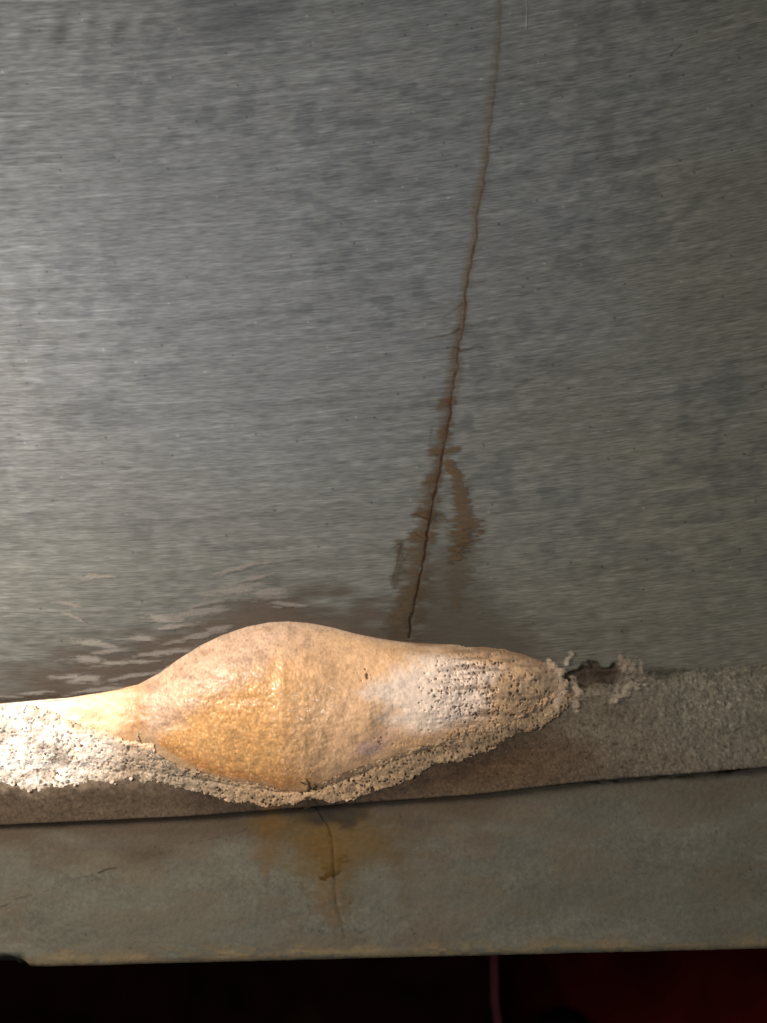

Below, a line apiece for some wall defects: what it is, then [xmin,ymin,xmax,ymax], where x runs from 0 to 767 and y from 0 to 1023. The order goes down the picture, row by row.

crack [398,67,497,638]
peeling [50,608,230,692]
peeling [209,562,305,606]
water stain [424,591,520,653]